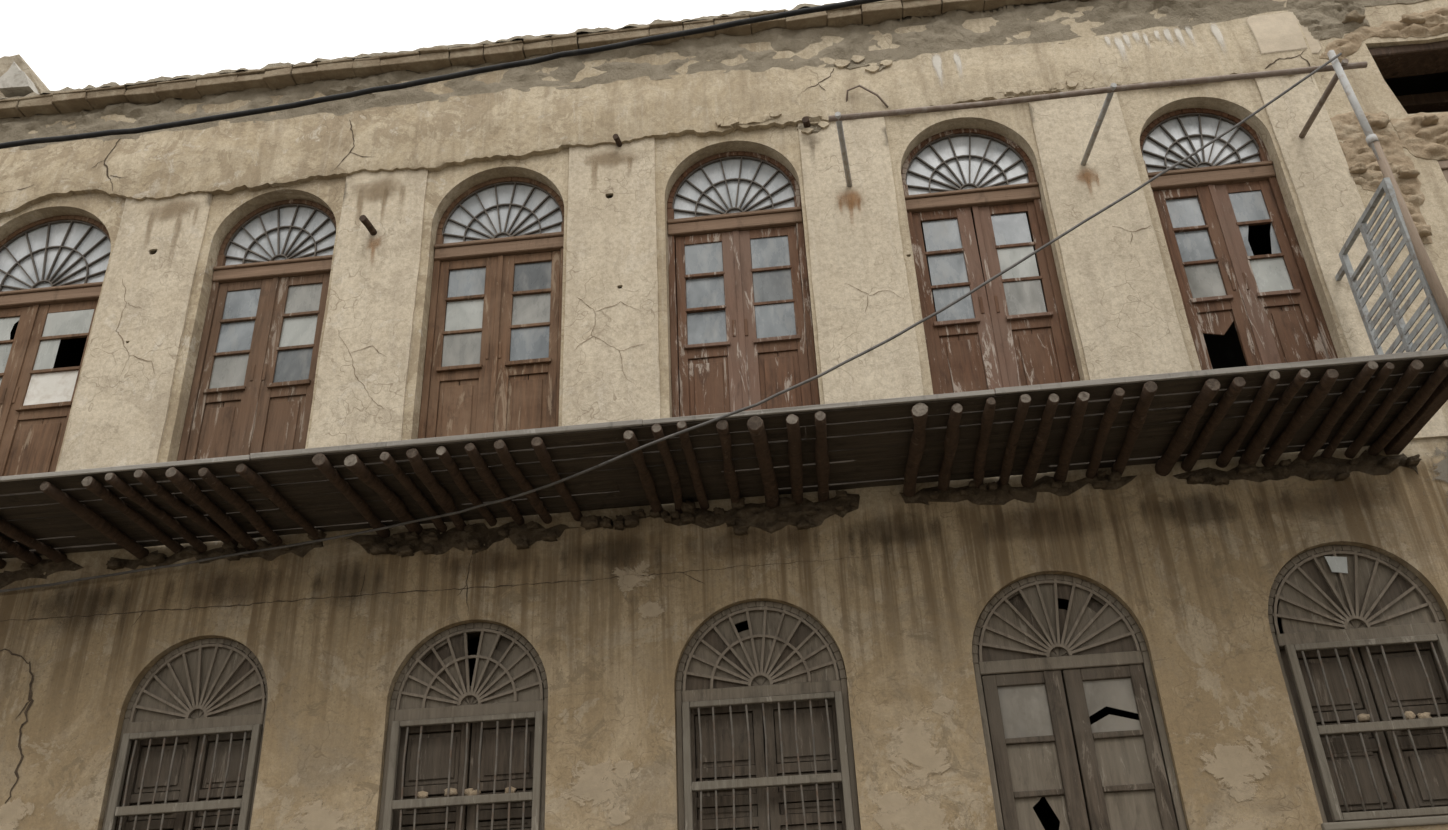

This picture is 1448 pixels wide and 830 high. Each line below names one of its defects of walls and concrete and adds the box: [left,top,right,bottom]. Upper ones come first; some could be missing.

spalling [1320,0,1448,62]
spalling [0,0,1287,150]
crack [92,139,124,191]
crack [331,120,376,172]
crack [0,552,911,804]